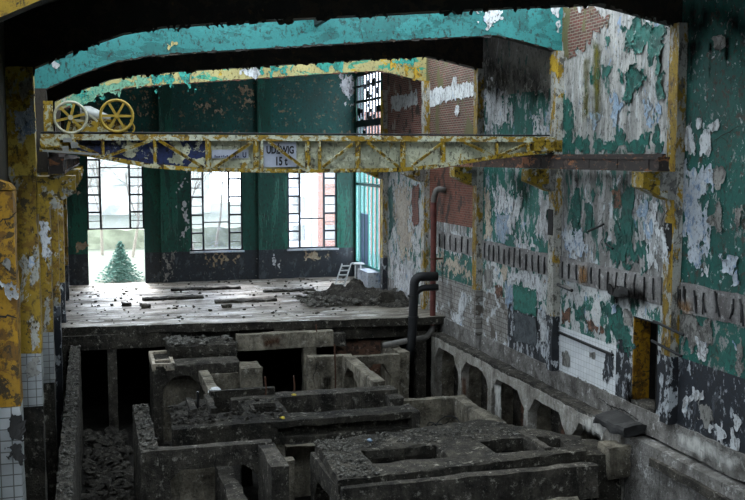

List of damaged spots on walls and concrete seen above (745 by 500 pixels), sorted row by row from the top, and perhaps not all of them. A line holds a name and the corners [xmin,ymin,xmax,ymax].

peeling [46,33,114,69]
peeling [60,55,425,118]
peeling [439,0,680,154]
peeling [682,118,739,286]
peeling [28,221,53,268]
peeling [387,179,420,298]
peeling [483,183,549,346]
peeling [561,184,670,392]
spalling [81,350,108,391]
spalling [117,347,165,389]
spalling [237,348,302,380]
peeling [682,386,742,451]